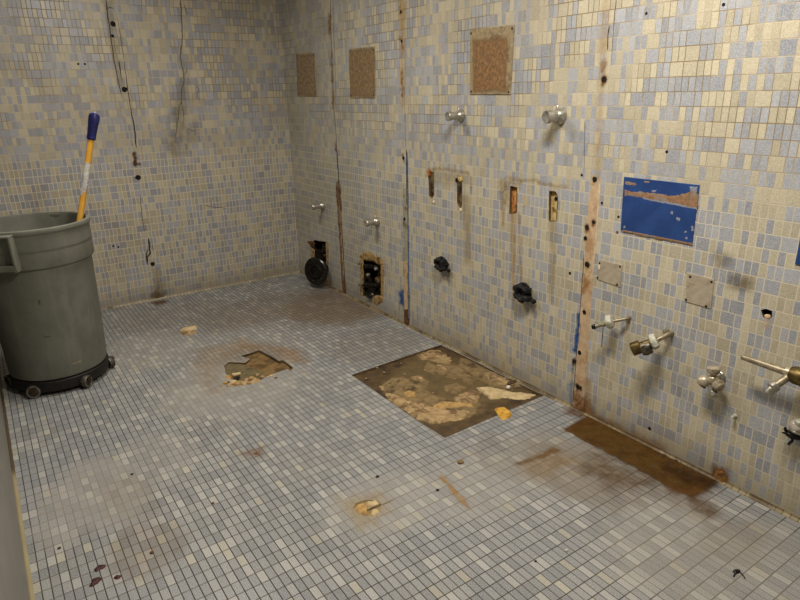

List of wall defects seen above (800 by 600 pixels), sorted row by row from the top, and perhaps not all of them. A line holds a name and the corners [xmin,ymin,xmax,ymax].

crack [106,1,137,148]
crack [175,0,200,142]
peeling [624,181,699,221]
peeling [220,350,293,387]
peeling [354,347,542,438]
spalling [348,500,393,523]